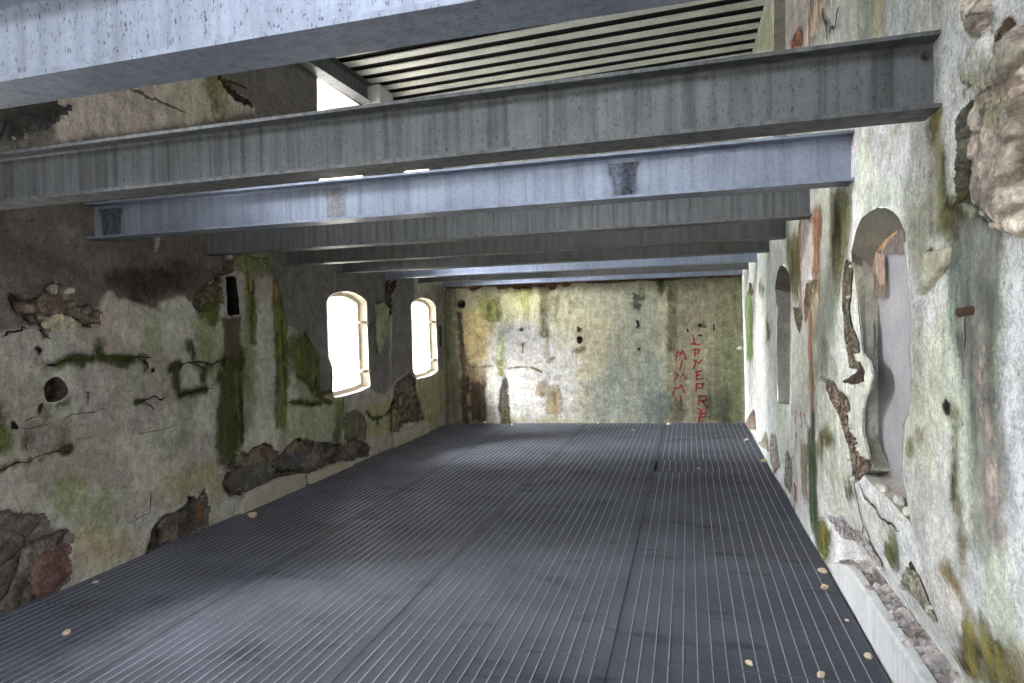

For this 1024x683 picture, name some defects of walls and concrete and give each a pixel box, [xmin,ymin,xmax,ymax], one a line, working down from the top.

crack [130,89,190,115]
flaking render [958,0,1024,239]
spalling [38,377,68,414]
flaking render [9,280,103,355]
leakage [222,316,245,369]
leakage [457,312,510,423]
flaking render [793,279,819,333]
corrosion [798,207,822,429]
crack [0,409,108,473]
flaking render [222,438,371,498]
flaking render [146,488,211,554]
flaking render [0,509,75,614]